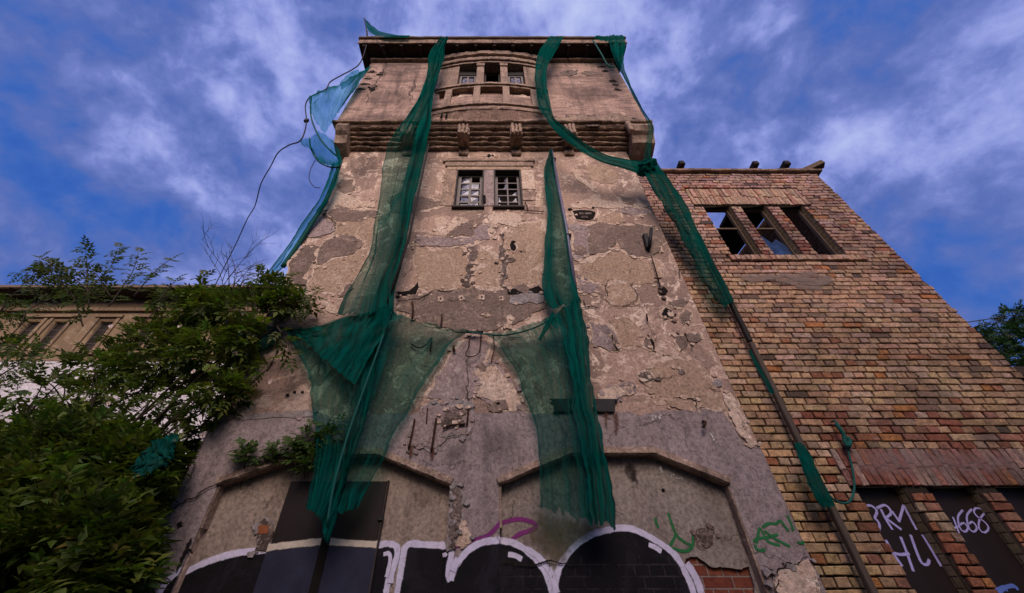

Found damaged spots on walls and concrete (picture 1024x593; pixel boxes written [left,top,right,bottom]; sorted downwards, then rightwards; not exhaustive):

flaking render [286,177,448,286]
flaking render [567,201,667,262]
flaking render [395,209,548,455]
flaking render [586,301,622,352]
spalling [629,282,703,376]
flaking render [445,518,475,552]